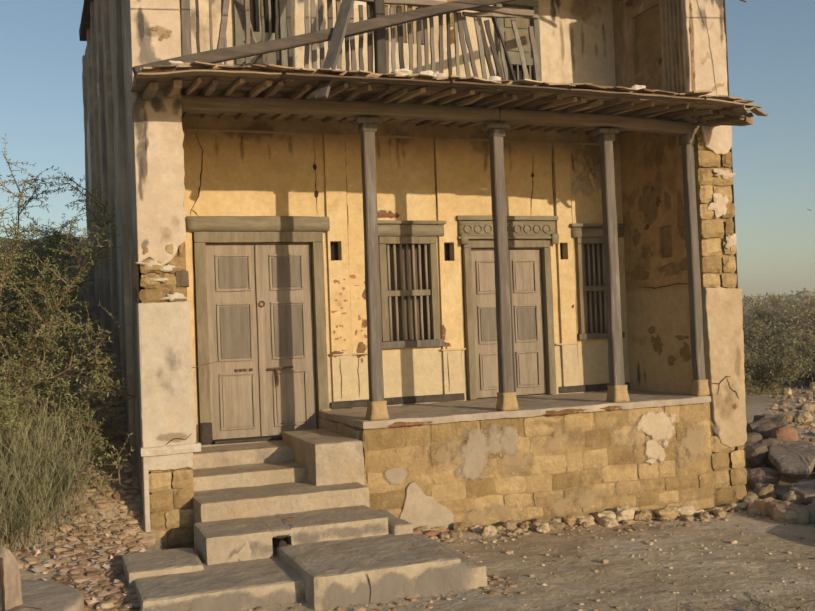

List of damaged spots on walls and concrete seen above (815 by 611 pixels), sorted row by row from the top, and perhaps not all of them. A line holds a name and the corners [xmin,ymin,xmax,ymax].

crack [190,134,203,216]
crack [312,139,320,202]
flaking render [377,210,400,218]
crack [531,150,554,207]
flaking render [631,170,688,281]
spalling [697,125,737,288]
spalling [132,243,187,303]
spalling [356,342,367,363]
crack [712,376,739,409]